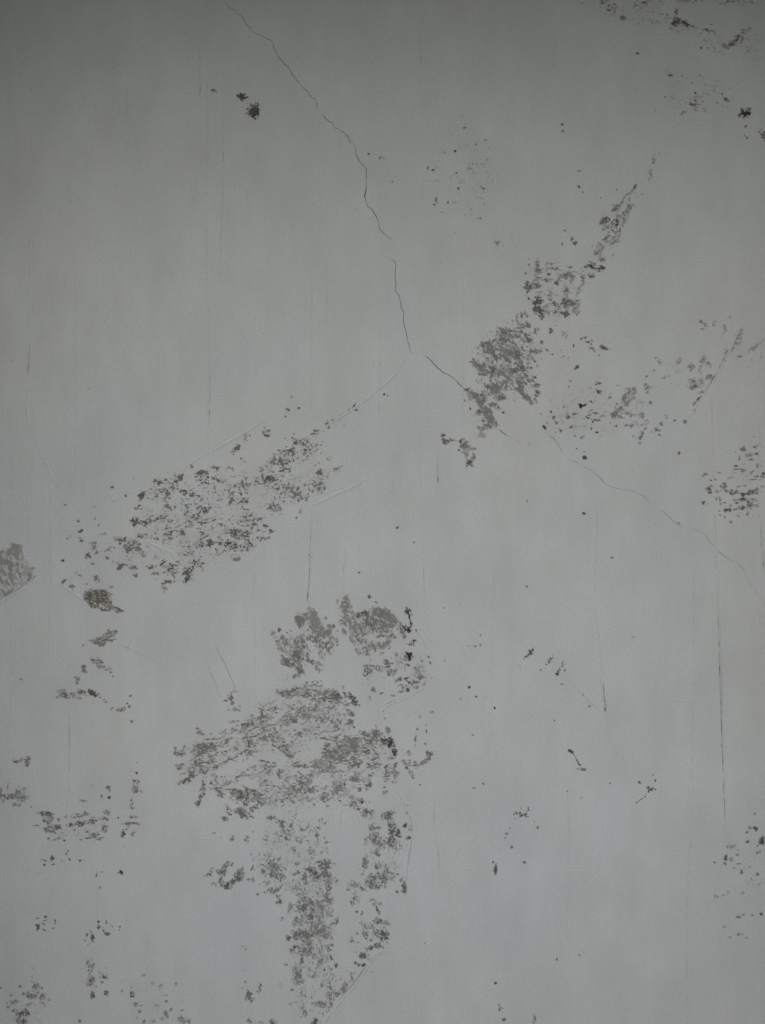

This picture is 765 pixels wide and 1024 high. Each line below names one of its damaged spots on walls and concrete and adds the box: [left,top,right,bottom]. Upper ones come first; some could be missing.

spalling [236,93,262,120]
crack [224,0,472,396]
peeling [440,106,765,469]
peeling [0,542,37,599]
peeling [61,402,358,614]
crack [499,428,765,605]
peeling [700,435,765,524]
peeling [53,628,134,724]
peeling [0,762,143,873]
peeling [172,593,446,1024]